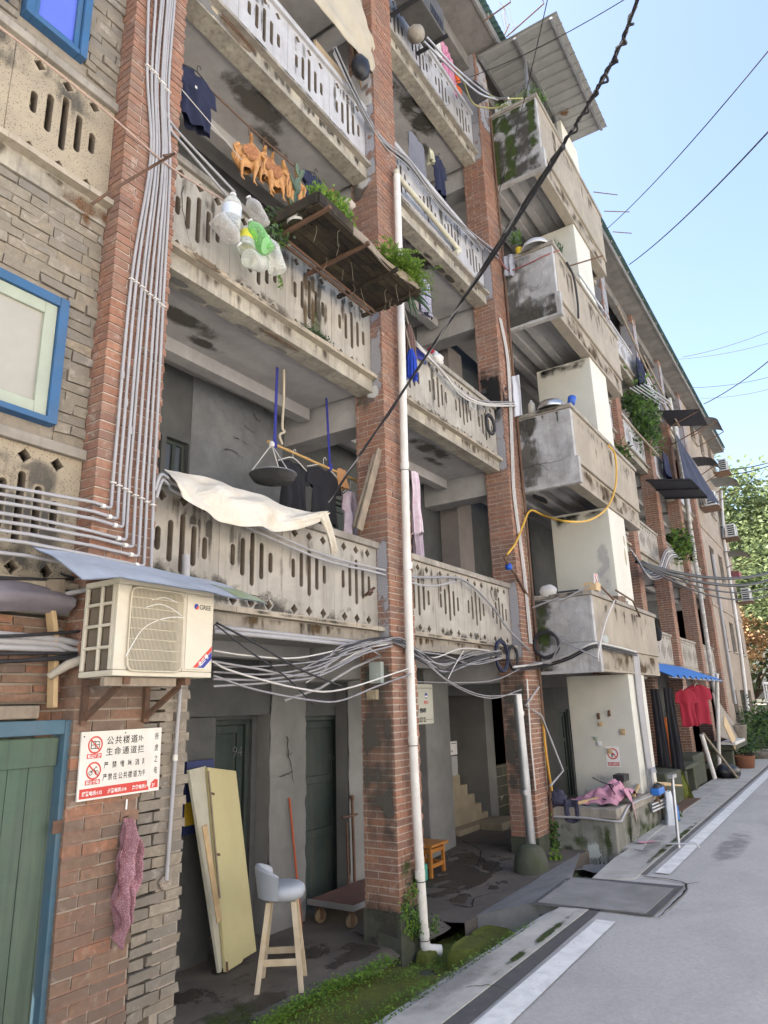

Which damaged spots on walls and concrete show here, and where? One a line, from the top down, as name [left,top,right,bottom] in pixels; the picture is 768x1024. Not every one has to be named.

leakage [222,74,282,151]
leakage [492,99,539,186]
leakage [167,305,215,350]
leakage [519,416,563,488]
crack [280,736,294,782]